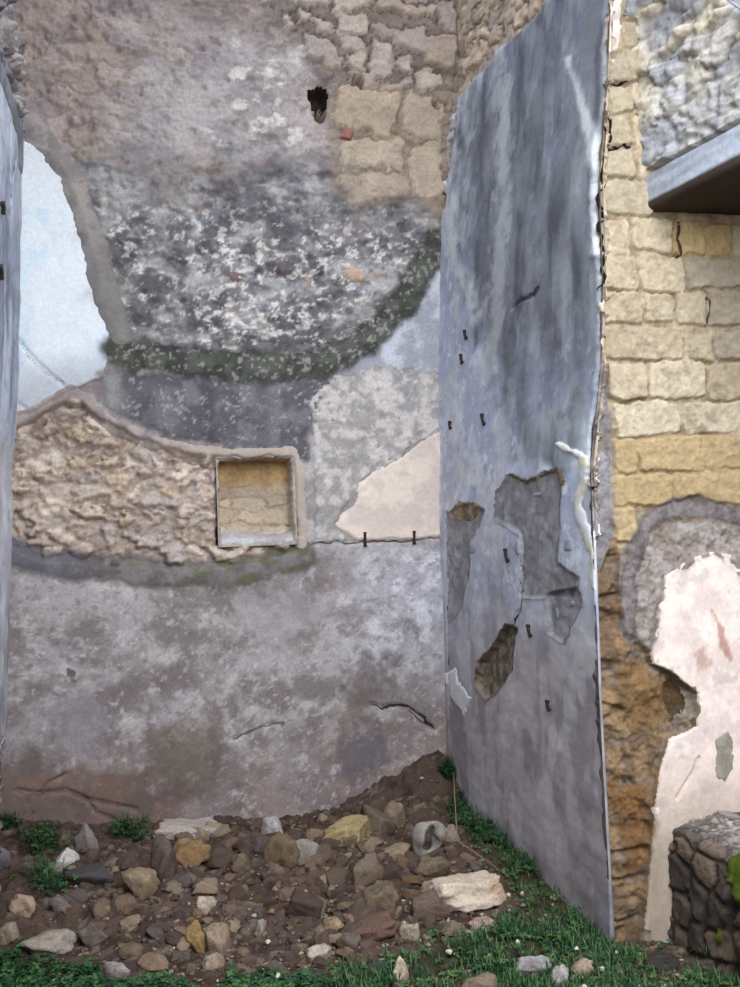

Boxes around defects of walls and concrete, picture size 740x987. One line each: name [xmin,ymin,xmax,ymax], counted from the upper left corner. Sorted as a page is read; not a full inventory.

flaking render [11,86,442,651]
crack [595,111,631,291]
crack [371,703,435,729]
flaking render [444,441,740,954]